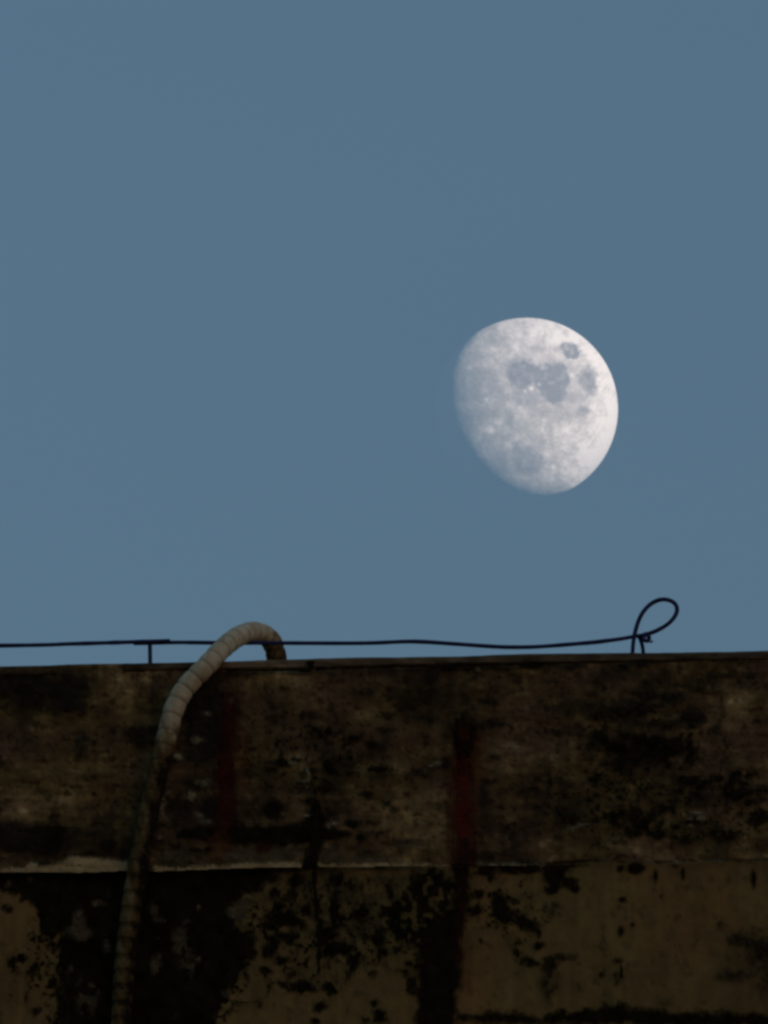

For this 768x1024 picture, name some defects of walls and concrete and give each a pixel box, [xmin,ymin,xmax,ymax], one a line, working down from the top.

water stain [0,811,130,1024]
water stain [131,670,768,1024]